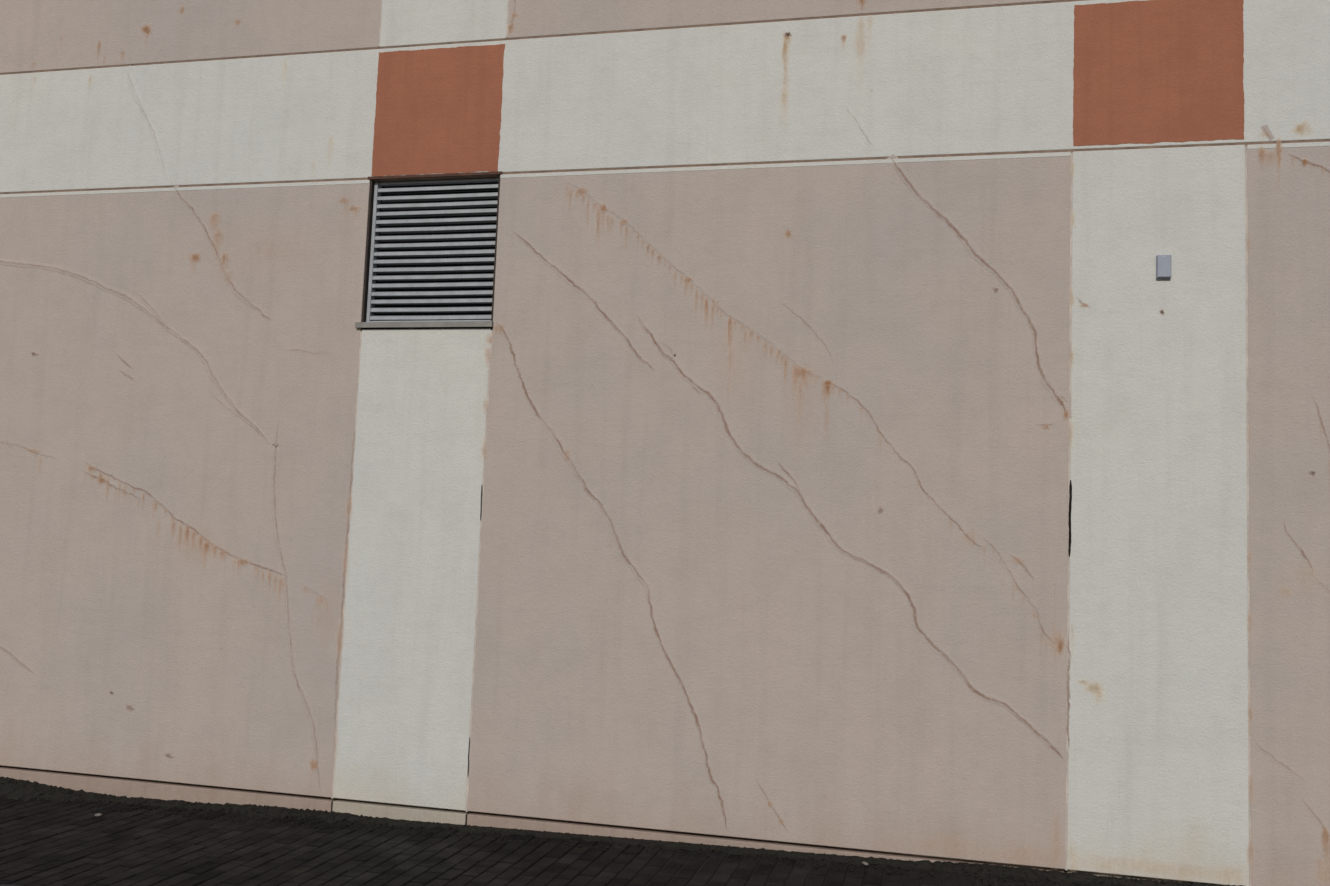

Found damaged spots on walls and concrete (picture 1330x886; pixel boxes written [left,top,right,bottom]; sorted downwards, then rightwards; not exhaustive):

crack [1286,150,1330,177]
crack [173,185,274,321]
crack [495,321,729,830]
crack [511,154,1072,763]
crack [1066,480,1074,557]